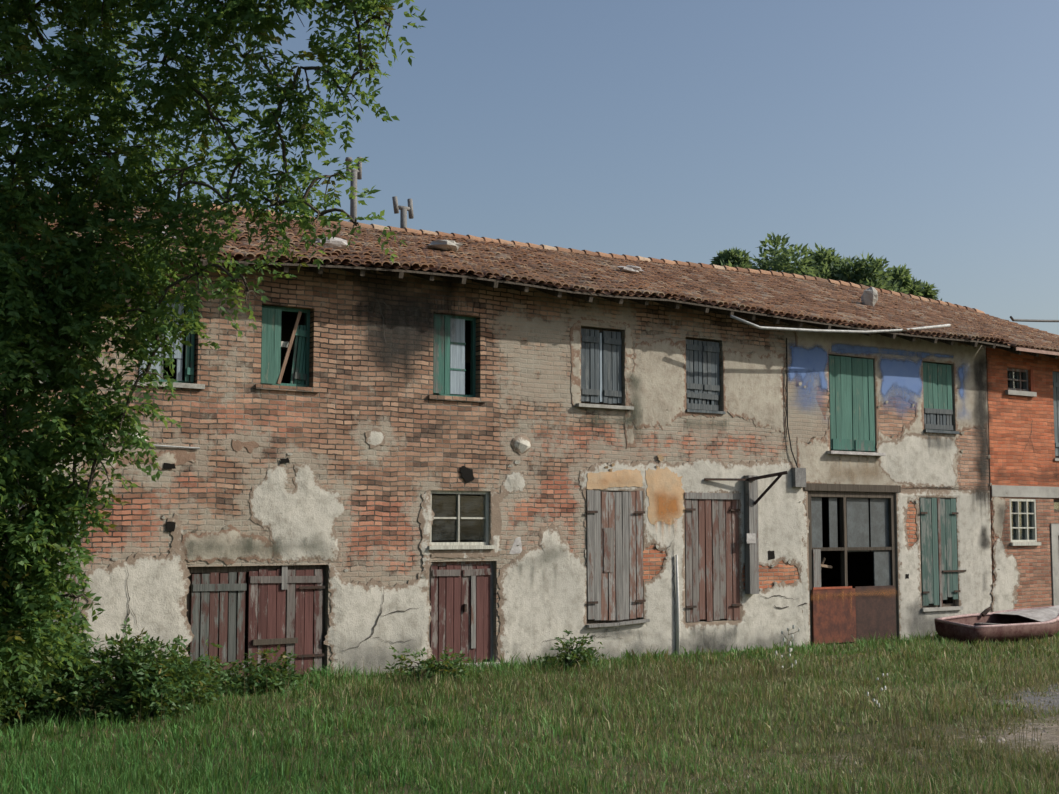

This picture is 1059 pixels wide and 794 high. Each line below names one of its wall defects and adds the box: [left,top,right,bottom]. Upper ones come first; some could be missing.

peeling [46,448,196,481]
peeling [78,317,992,676]
crack [125,570,137,645]
crack [344,585,418,651]